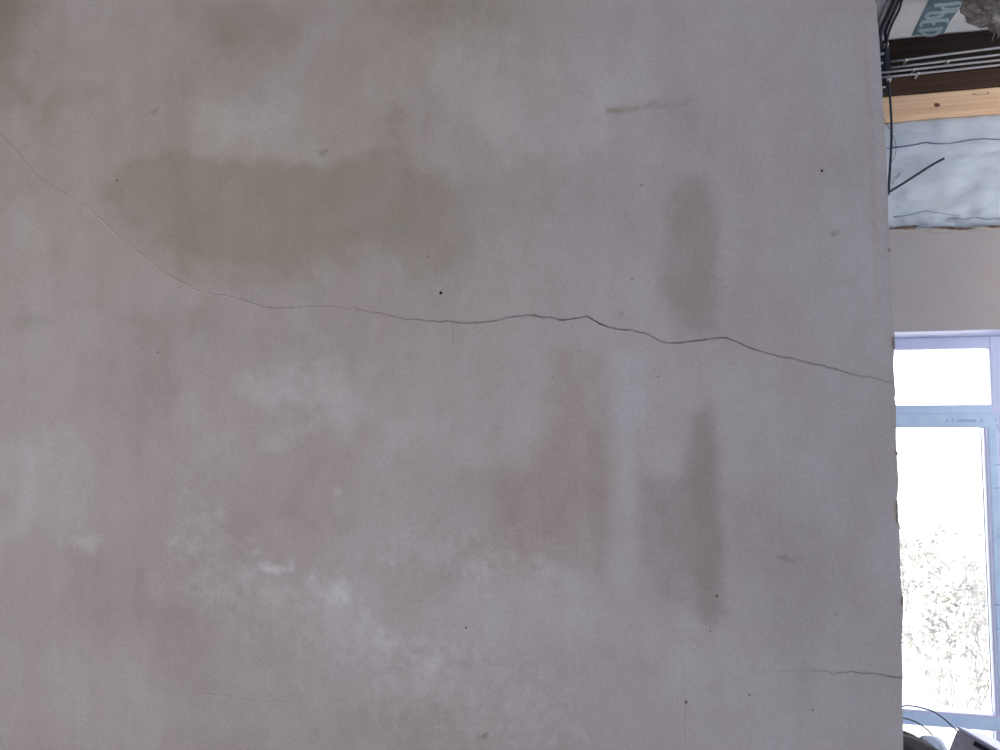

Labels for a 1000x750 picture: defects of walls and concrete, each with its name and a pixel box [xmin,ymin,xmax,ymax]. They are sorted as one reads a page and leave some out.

water stain [0,0,736,647]
water stain [68,286,902,750]
crack [514,315,755,350]